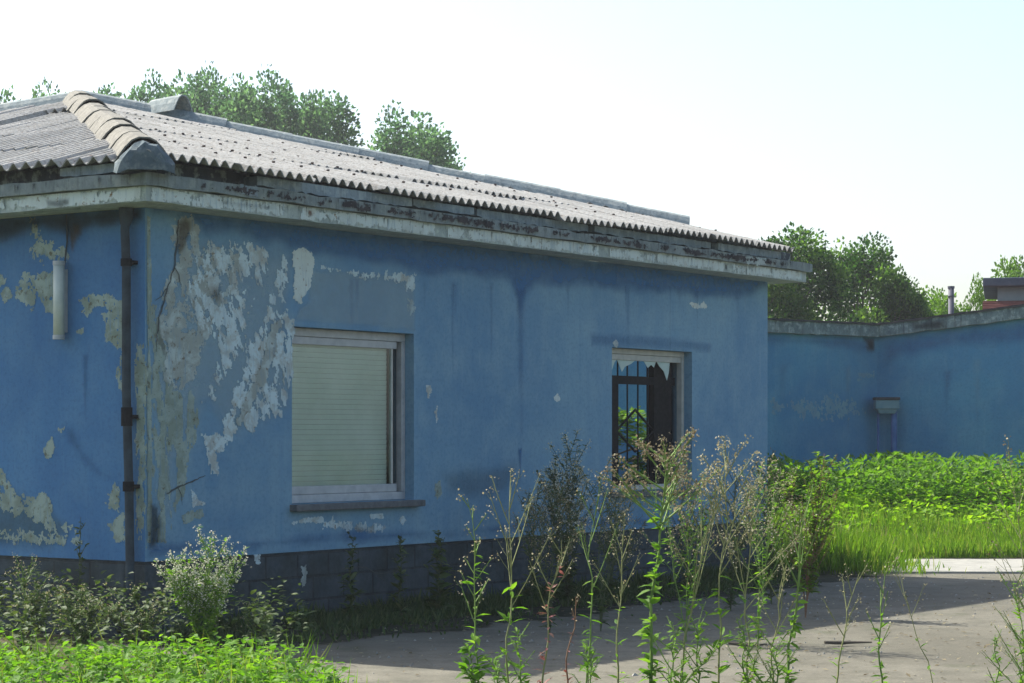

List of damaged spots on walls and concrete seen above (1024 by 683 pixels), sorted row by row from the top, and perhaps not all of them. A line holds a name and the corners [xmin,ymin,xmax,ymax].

crack [156,220,182,352]
peeling [0,163,802,549]
crack [167,475,206,501]